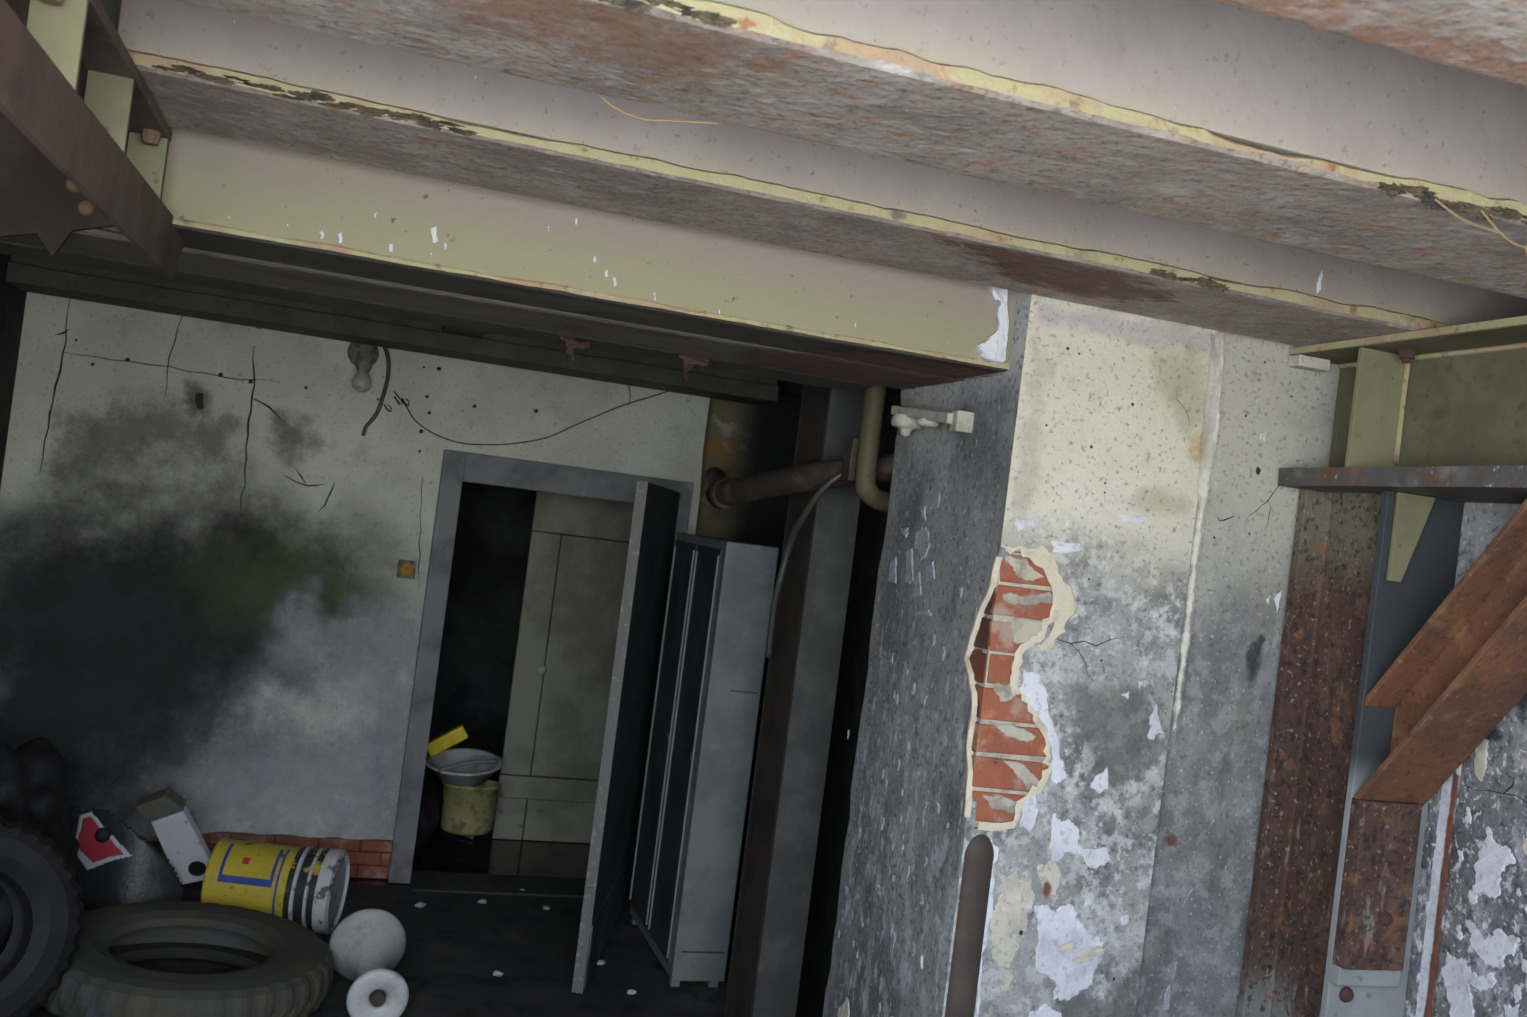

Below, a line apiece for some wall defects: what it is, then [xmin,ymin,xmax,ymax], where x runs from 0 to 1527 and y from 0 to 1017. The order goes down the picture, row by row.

corrosion [938,240,1179,303]
crack [40,299,282,509]
crack [285,468,334,511]
peeling [888,492,946,661]
peeling [890,653,928,705]
peeling [1147,704,1163,740]
flaking render [925,515,1111,1017]
peeling [1474,739,1489,782]
peeling [875,815,928,895]
peeling [1441,798,1527,1017]
peeling [890,923,923,969]
peeling [838,997,850,1017]